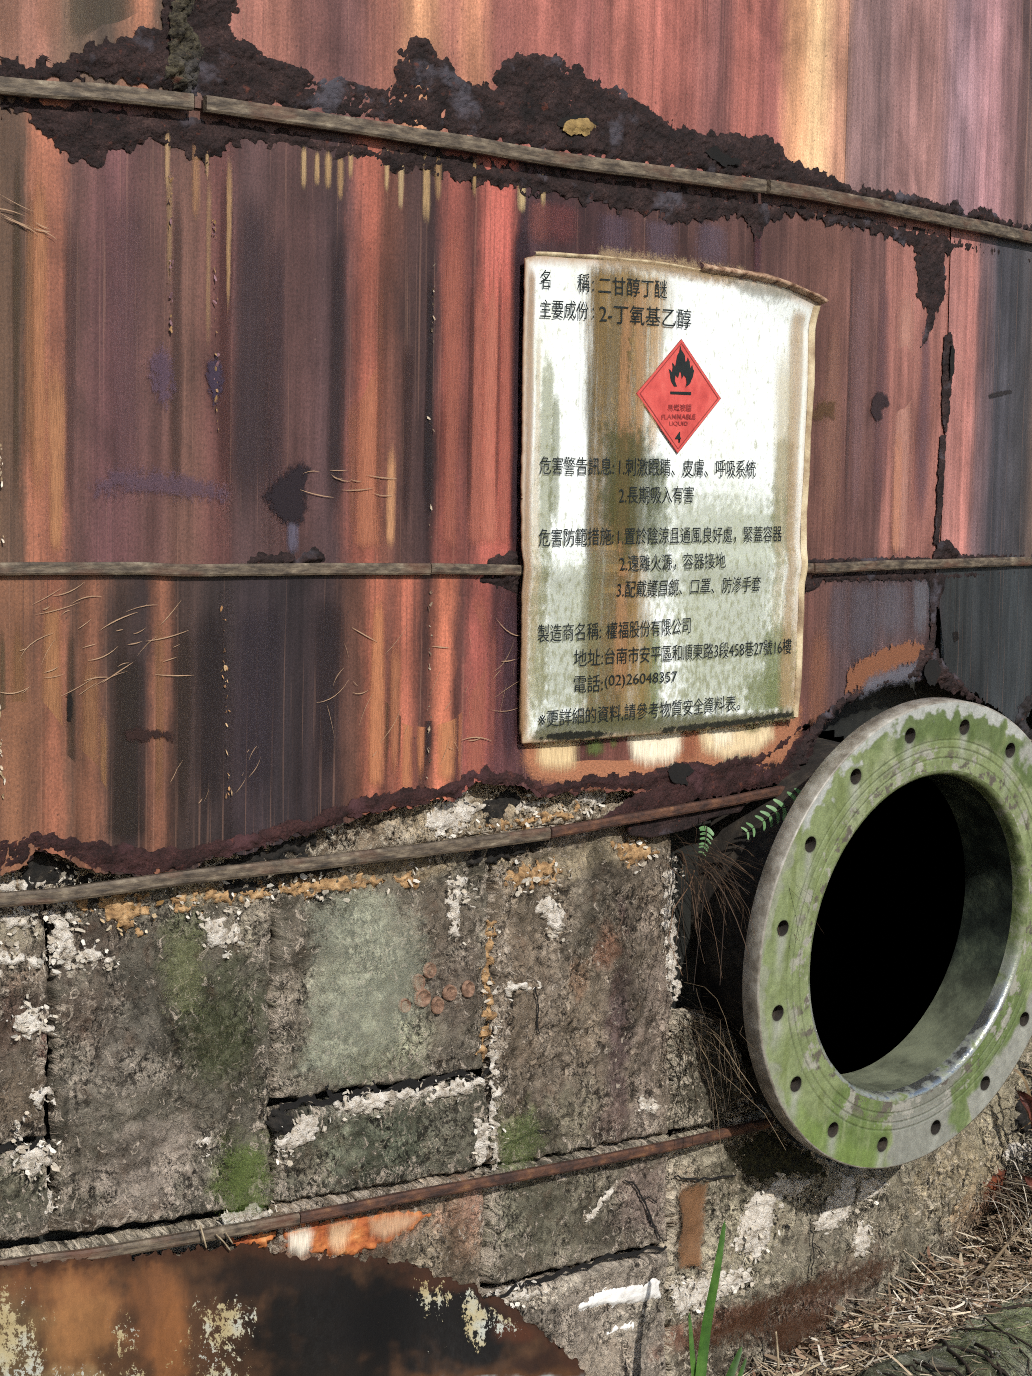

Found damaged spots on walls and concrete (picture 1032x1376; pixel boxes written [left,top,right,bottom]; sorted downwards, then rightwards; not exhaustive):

corrosion [0,0,1032,876]
corrosion [230,1210,432,1257]
corrosion [678,1251,898,1362]